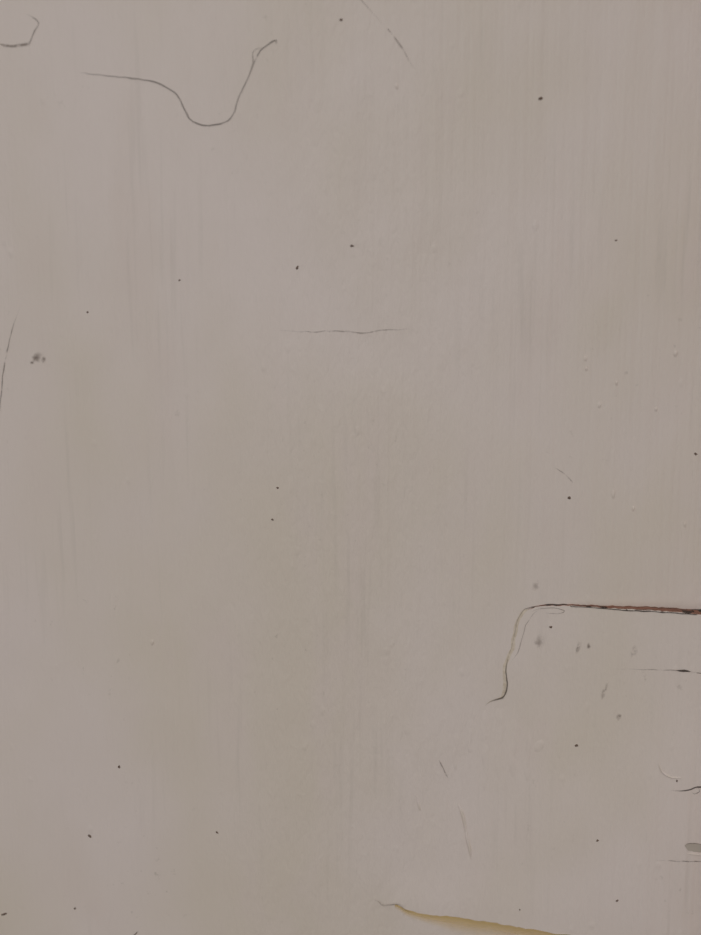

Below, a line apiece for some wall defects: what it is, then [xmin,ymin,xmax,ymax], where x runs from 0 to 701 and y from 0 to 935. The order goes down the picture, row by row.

crack [160,84,227,126]